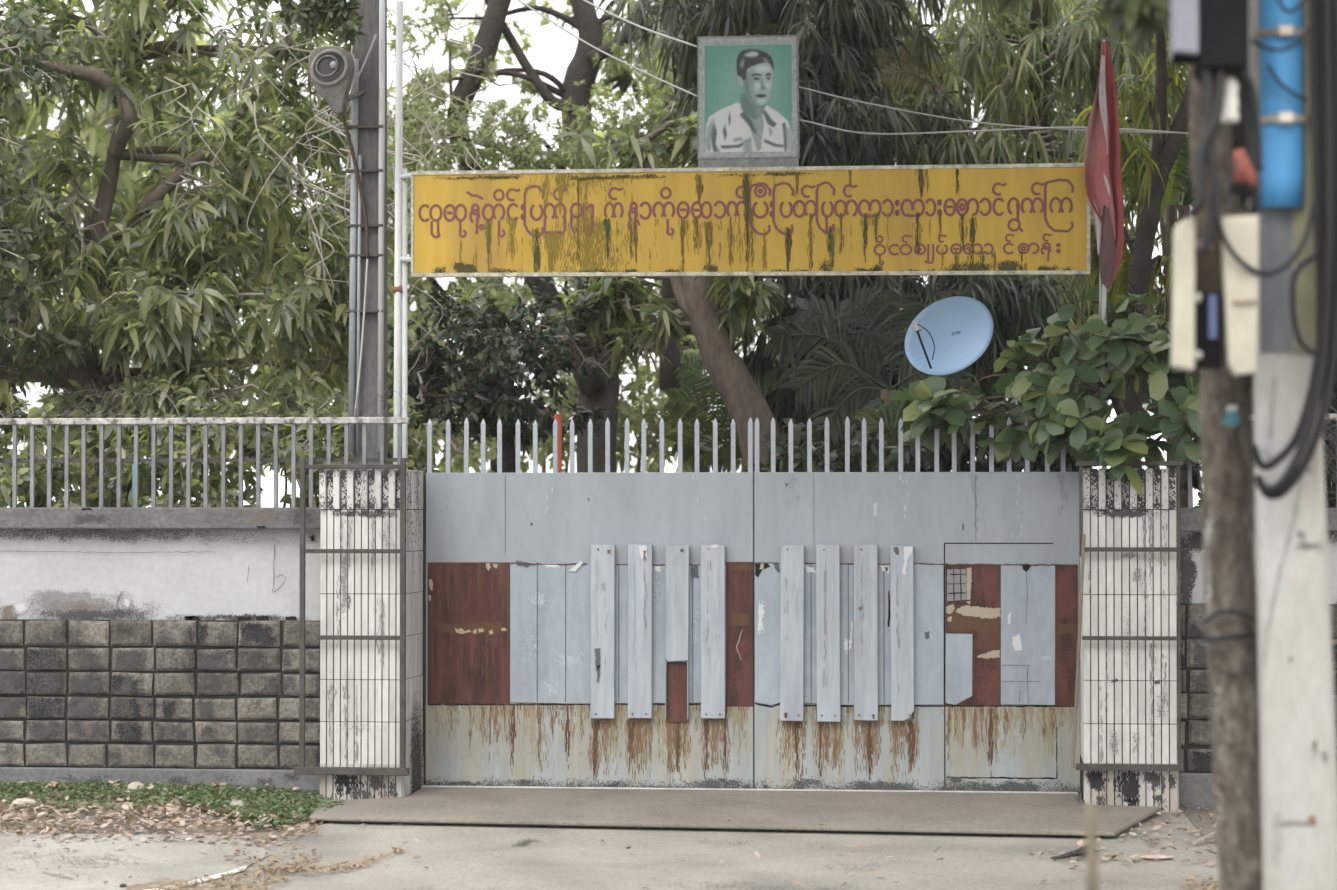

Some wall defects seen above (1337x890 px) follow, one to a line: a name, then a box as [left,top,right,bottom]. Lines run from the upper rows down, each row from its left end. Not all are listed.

damp [0,469,422,645]
damp [0,598,308,748]
damp [375,600,385,669]